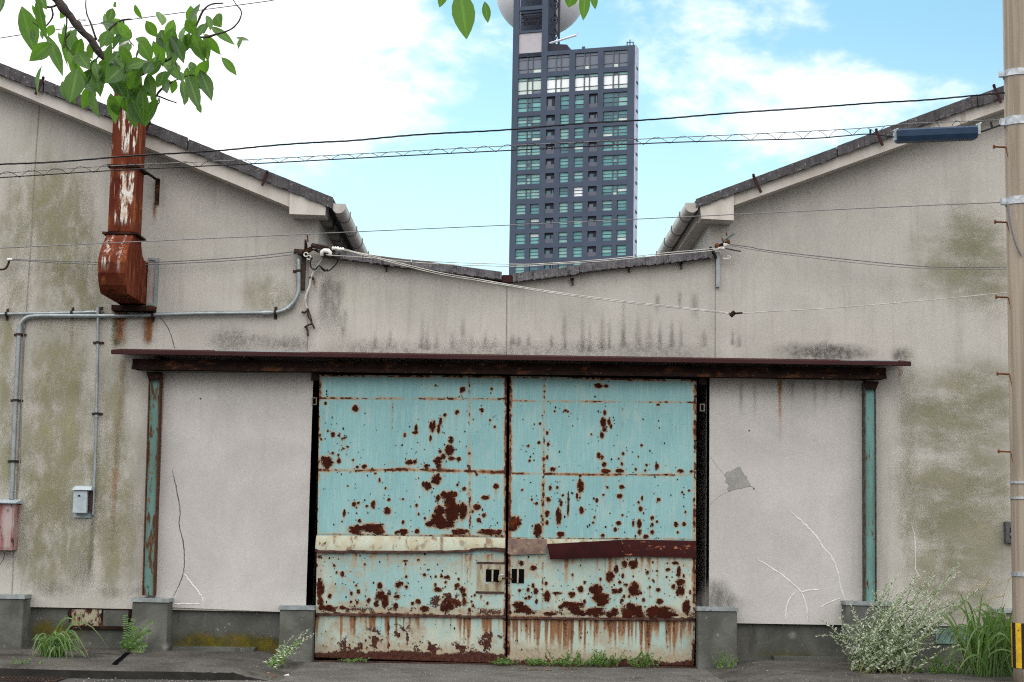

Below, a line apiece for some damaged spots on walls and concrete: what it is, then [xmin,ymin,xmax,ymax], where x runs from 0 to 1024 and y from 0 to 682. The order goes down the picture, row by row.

rust [116,312,125,343]
rust [144,317,153,341]
rust [319,377,695,540]
spalling [711,458,754,500]
crack [172,470,204,606]
rust [316,553,492,649]
rust [505,554,691,651]
crack [758,511,846,621]